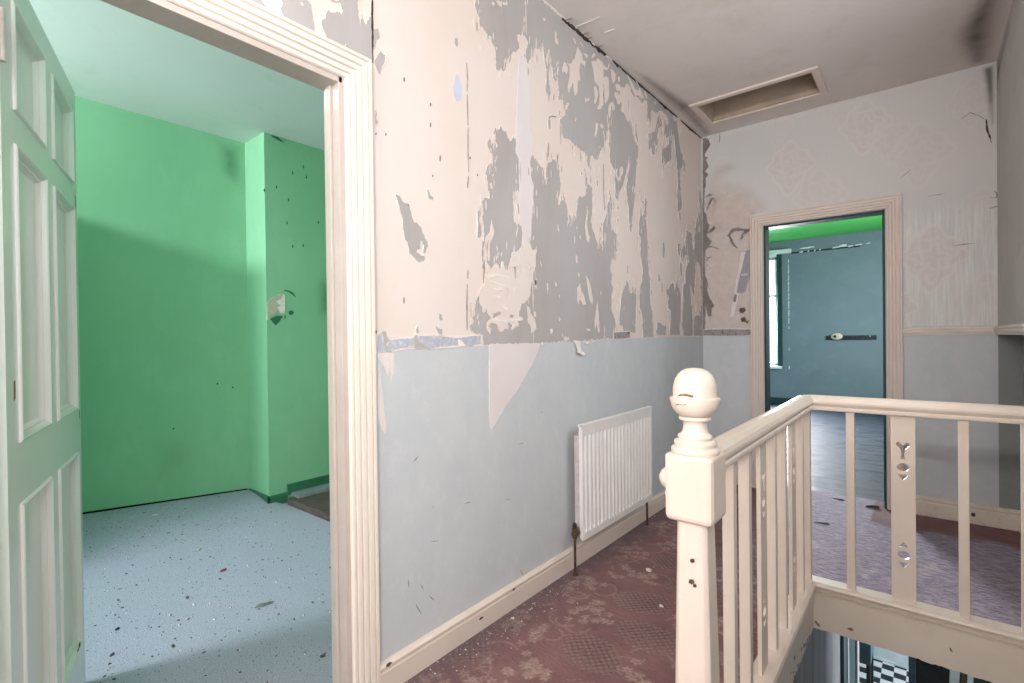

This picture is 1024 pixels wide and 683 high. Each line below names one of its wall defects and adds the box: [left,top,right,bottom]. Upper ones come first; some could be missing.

peeling [252,0,386,74]
crack [963,112,992,143]
peeling [469,0,714,346]
peeling [395,194,429,262]
peeling [267,290,296,325]
peeling [733,250,750,302]